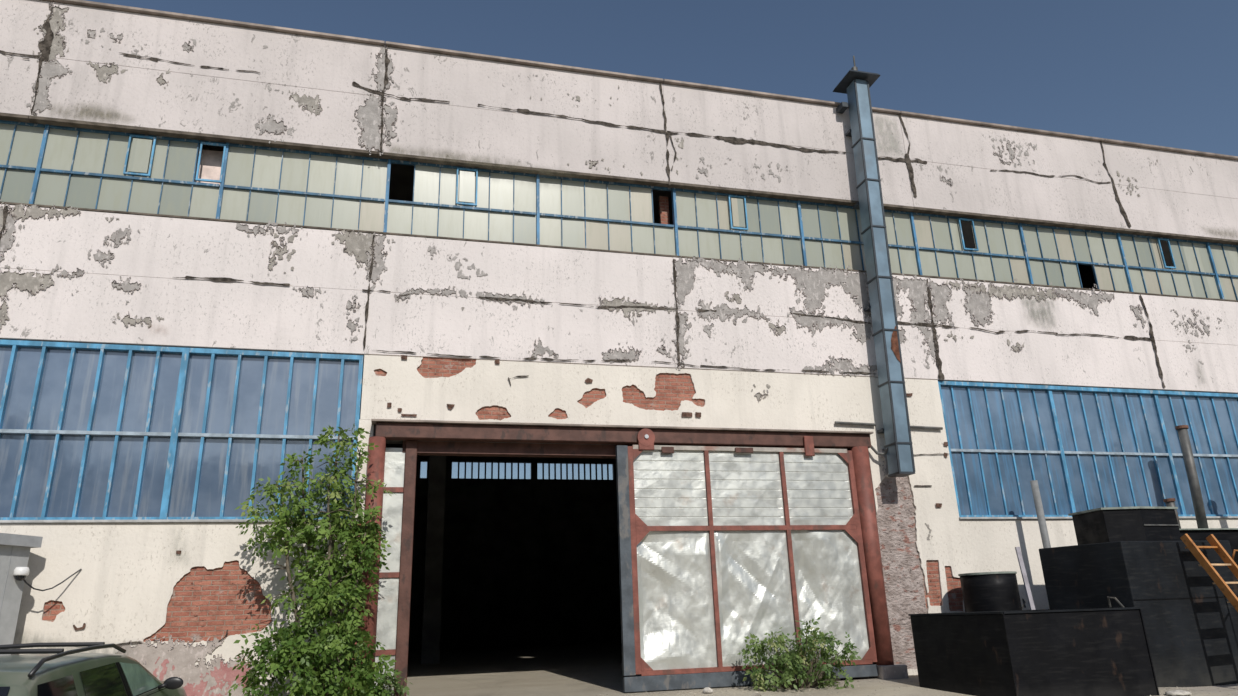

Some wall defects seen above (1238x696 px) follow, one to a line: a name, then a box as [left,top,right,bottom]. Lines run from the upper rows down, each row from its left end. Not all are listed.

crack [0,7,54,113]
crack [352,49,846,185]
crack [878,114,927,197]
crack [990,141,1131,227]
peeling [0,199,164,332]
flaking render [401,355,478,378]
crack [362,235,875,386]
peeling [599,255,877,417]
crack [790,279,1165,388]
peeling [892,273,1115,369]
flaking render [875,448,963,669]
flaking render [115,560,272,696]